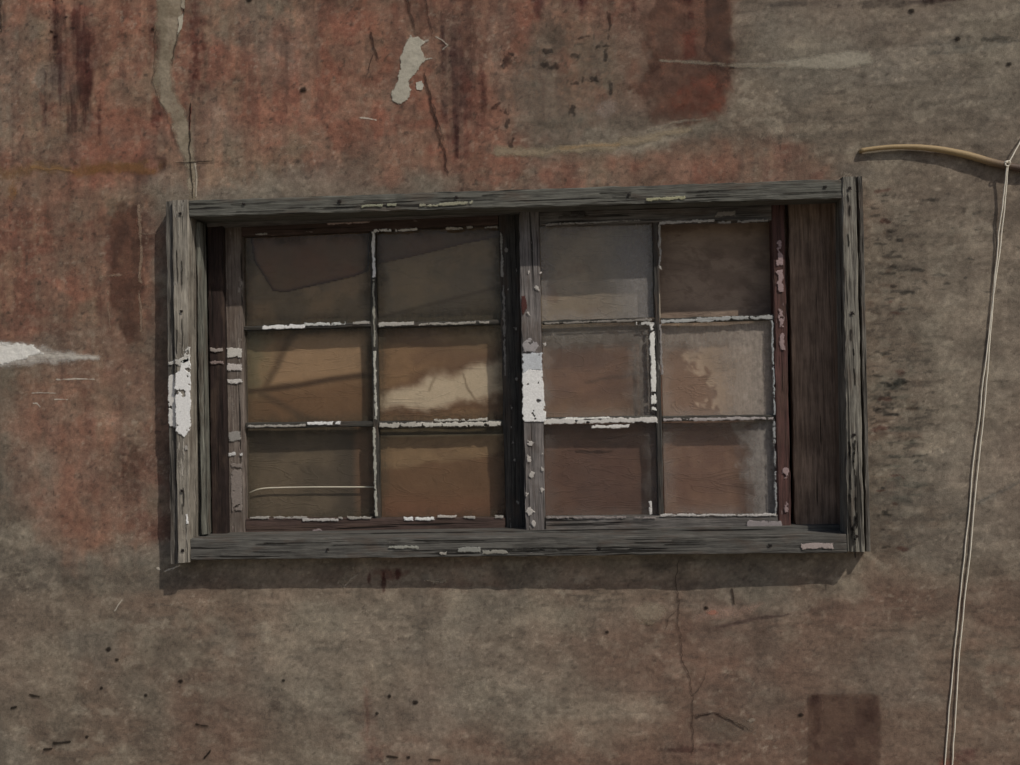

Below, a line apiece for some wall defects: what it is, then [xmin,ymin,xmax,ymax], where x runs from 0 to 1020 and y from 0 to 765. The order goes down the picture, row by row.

crack [153,0,210,200]
crack [667,561,748,755]